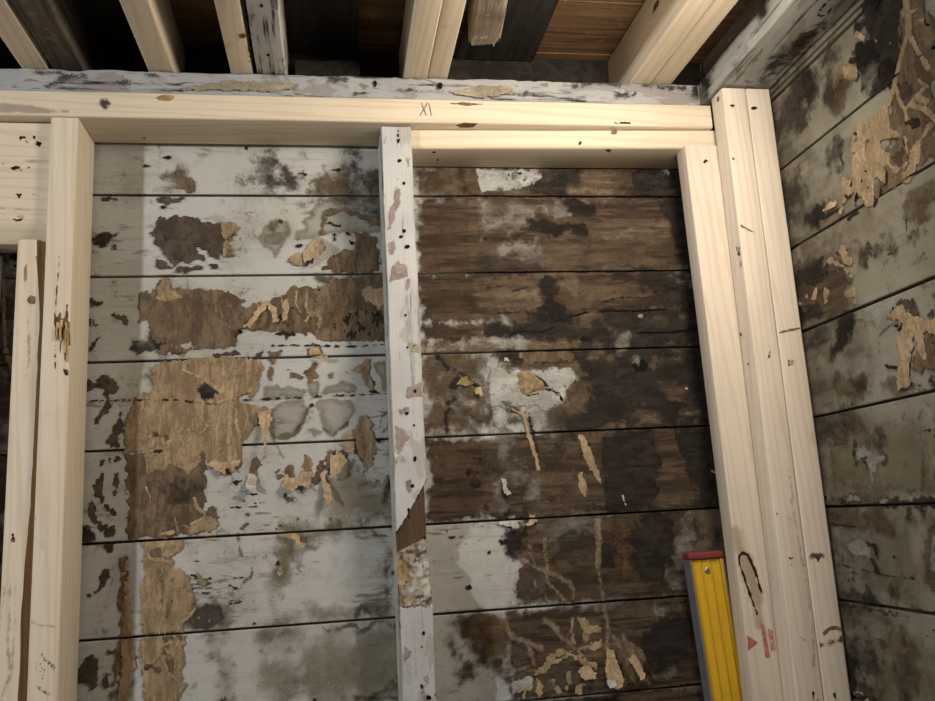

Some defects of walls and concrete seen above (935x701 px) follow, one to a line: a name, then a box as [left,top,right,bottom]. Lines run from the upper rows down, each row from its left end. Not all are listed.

damp [760,0,903,134]
damp [249,150,298,190]
damp [259,163,381,256]
damp [567,170,621,199]
damp [781,169,825,229]
peeling [822,103,900,221]
peeling [138,168,386,383]
damp [421,350,493,438]
peeling [493,348,596,427]
peeling [887,298,935,391]
peeling [275,415,382,503]
peeling [578,647,646,689]